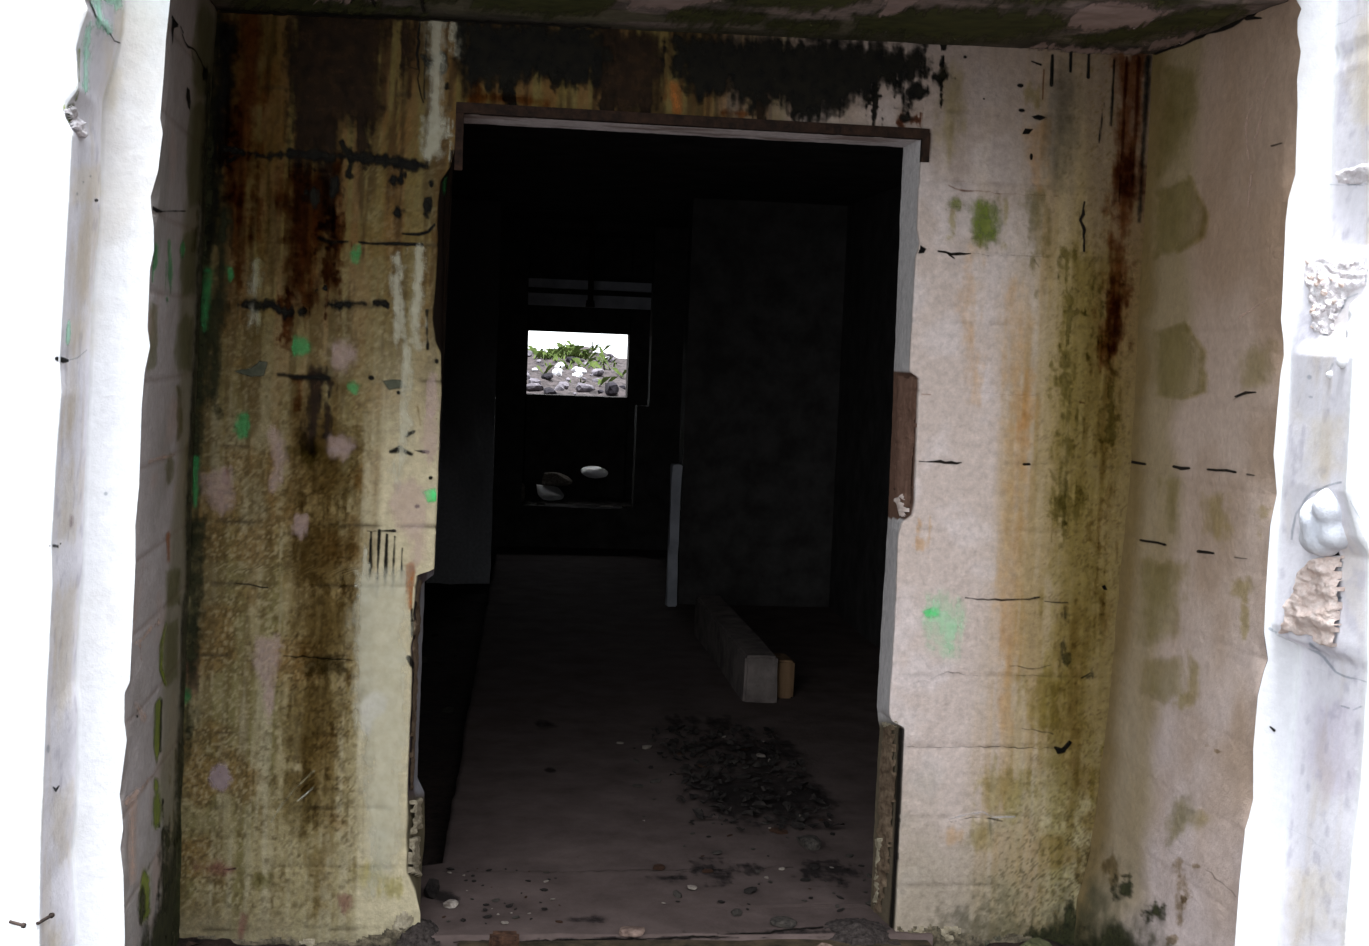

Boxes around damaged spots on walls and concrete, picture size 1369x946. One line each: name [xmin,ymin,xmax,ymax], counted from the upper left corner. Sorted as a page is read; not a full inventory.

damp [1043,51,1090,87]
damp [285,15,949,230]
damp [203,23,238,415]
damp [423,151,455,379]
spalling [1304,253,1368,335]
damp [297,366,334,454]
damp [186,519,206,686]
damp [368,529,403,598]
spalling [1278,555,1345,648]